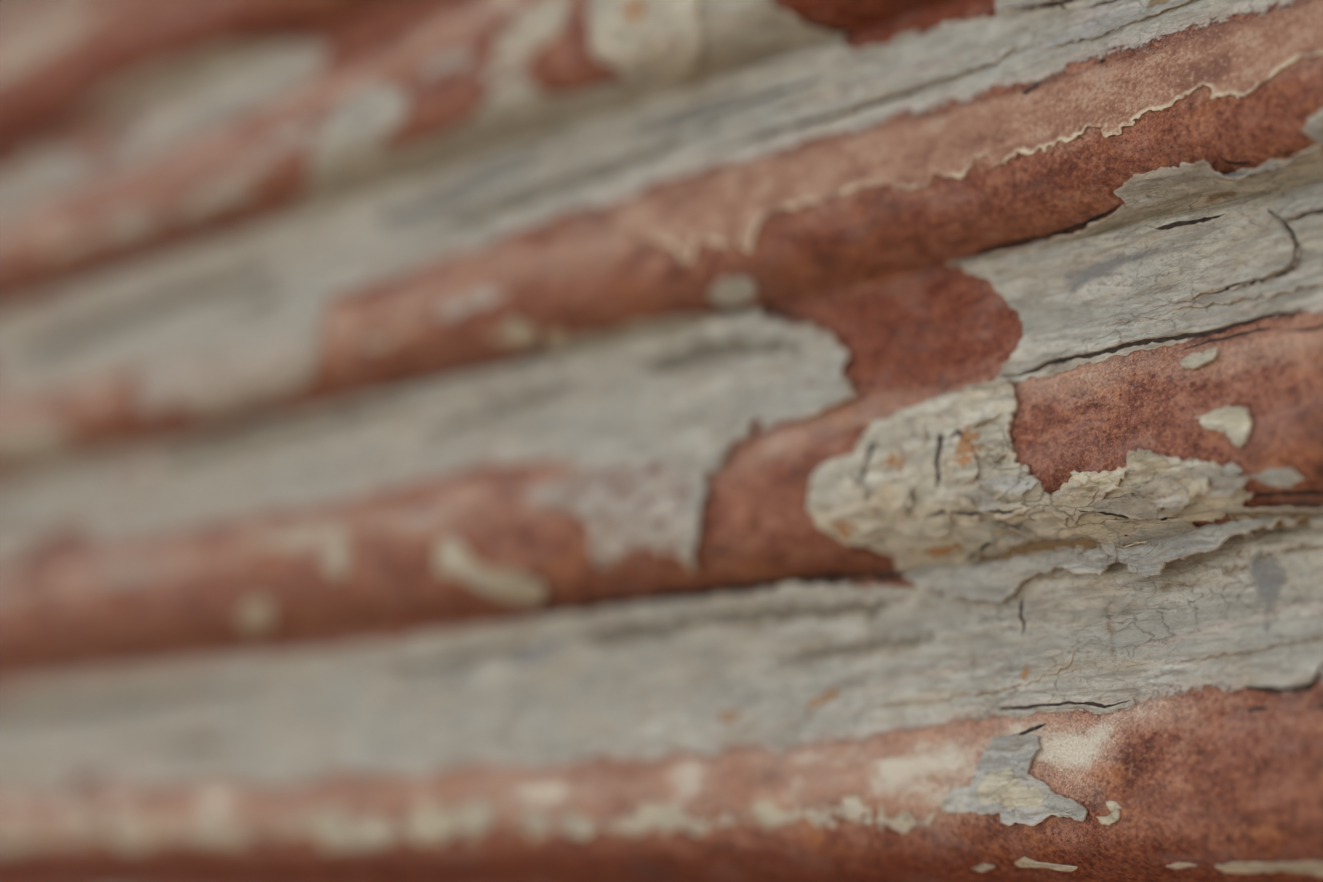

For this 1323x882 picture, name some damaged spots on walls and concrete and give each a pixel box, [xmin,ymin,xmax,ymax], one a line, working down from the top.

crack [1217,149,1297,177]
crack [955,204,1120,266]
peeling [0,0,1323,578]
crack [998,202,1323,377]
rust [954,428,982,467]
crack [1018,595,1026,635]
peeling [0,504,1323,853]
crack [1245,660,1323,712]
crack [996,700,1131,736]
peeling [972,863,995,873]
peeling [1015,857,1078,872]
peeling [1215,861,1323,877]